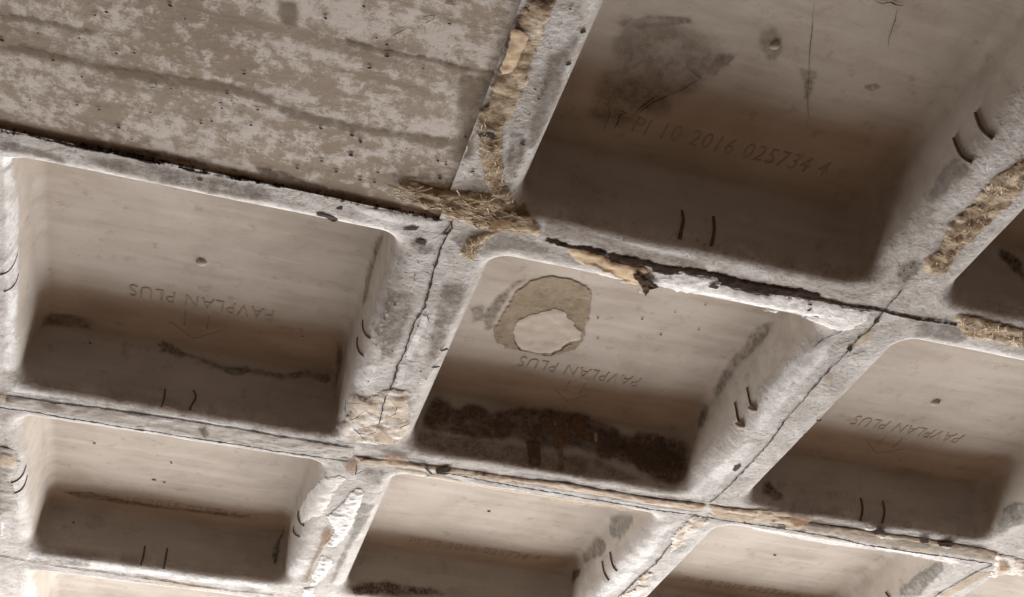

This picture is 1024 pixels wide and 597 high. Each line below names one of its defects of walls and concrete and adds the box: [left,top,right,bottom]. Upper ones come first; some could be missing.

peeling [500,29,529,74]
spalling [402,225,427,245]
crack [390,221,453,390]
peeling [493,277,592,356]
peeling [567,249,659,296]
leakage [0,365,686,484]
crack [618,289,903,597]